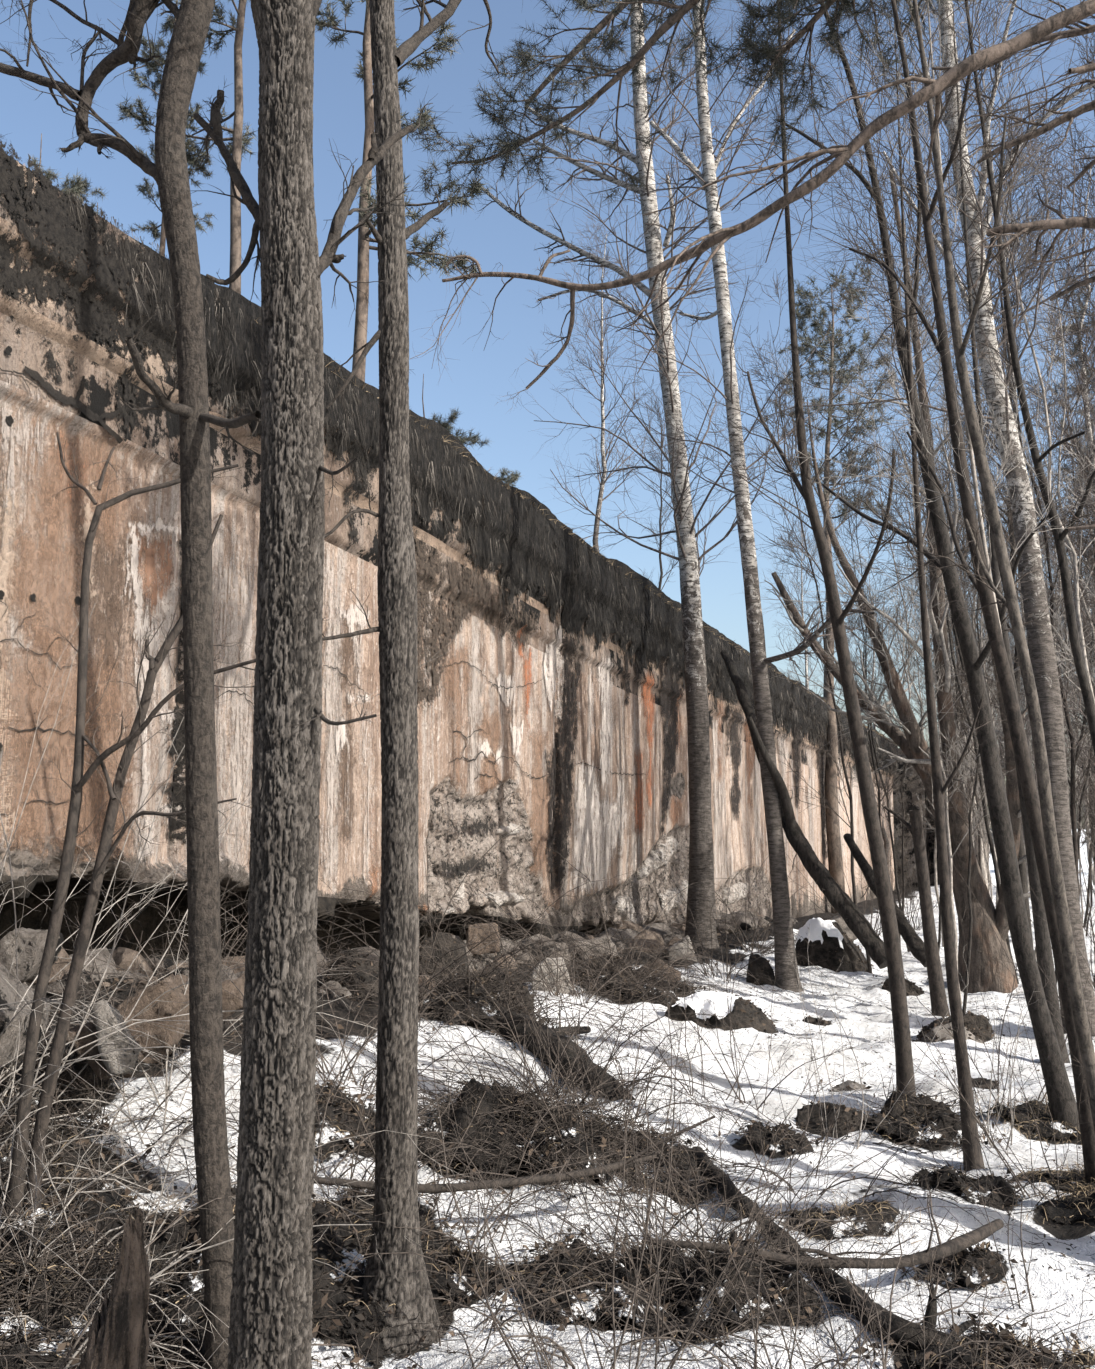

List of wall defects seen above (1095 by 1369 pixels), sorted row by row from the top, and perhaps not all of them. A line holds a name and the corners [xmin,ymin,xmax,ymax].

water stain [0,135,187,862]
rust [135,530,174,610]
peeling [478,672,524,763]
water stain [413,529,642,899]
peeling [544,626,564,711]
rust [634,674,655,833]
water stain [655,658,682,845]
spalling [419,776,690,934]